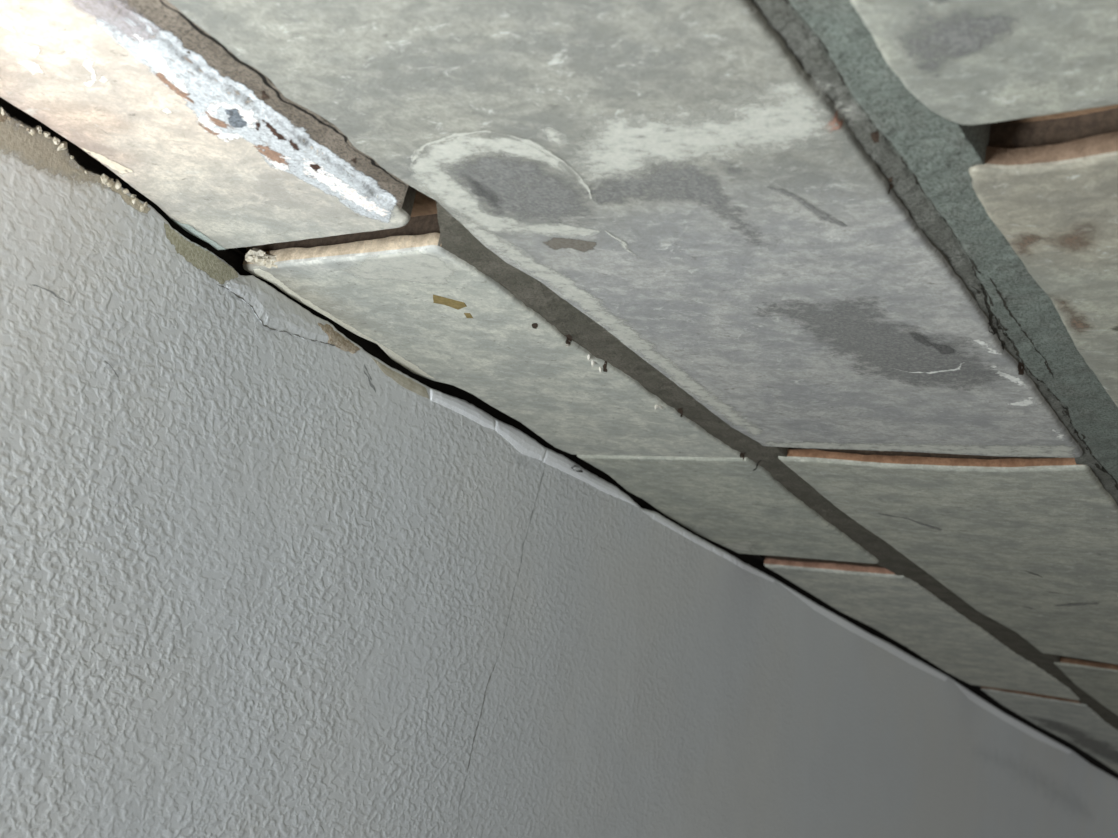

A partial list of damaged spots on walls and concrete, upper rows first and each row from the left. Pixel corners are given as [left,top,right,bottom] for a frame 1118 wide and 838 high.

flaking render [0,108,150,214]
peeling [164,223,360,354]
peeling [433,295,473,318]
water stain [411,82,1074,457]
crack [784,0,1118,490]
crack [457,463,546,836]
spalling [372,358,1072,754]